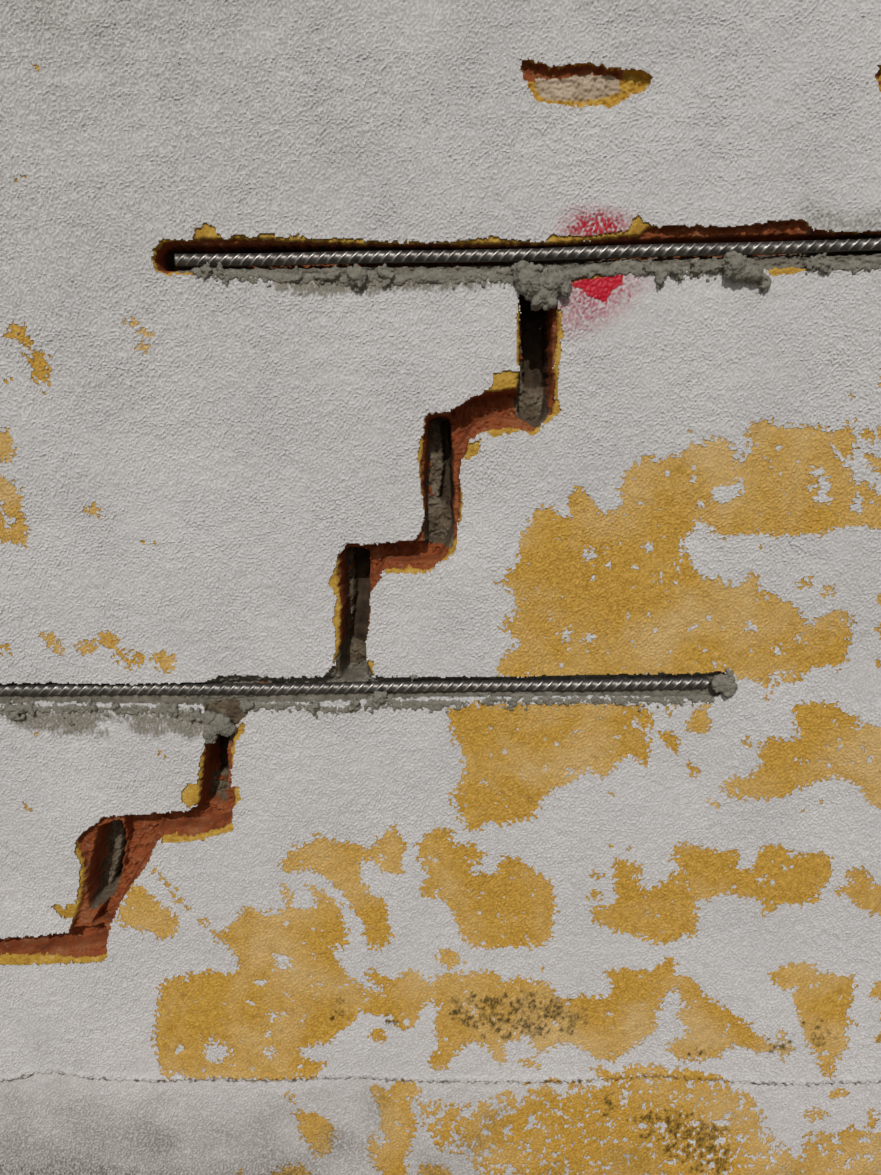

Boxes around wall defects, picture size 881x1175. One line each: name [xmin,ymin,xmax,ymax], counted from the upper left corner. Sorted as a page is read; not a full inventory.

spalling [519,59,653,109]
peeling [3,321,52,395]
crack [328,294,564,673]
spalling [151,215,881,276]
crack [0,698,249,966]
peeling [0,417,881,1175]